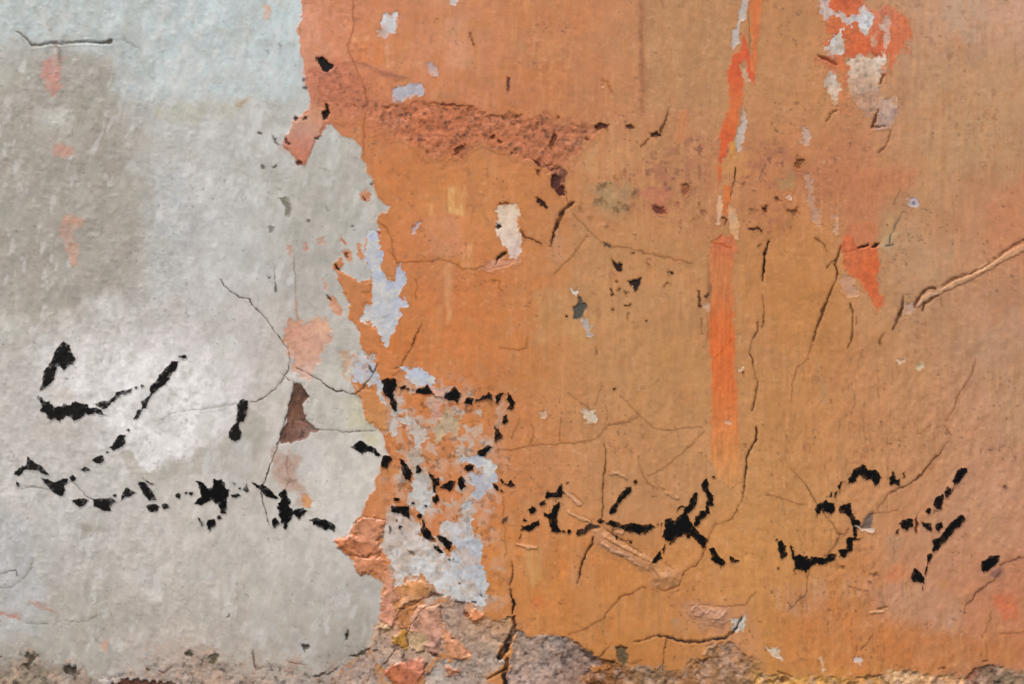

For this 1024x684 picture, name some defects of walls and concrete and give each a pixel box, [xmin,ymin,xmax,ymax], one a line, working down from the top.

crack [15,31,140,65]
flaking render [282,56,611,211]
peeling [813,0,913,154]
peeling [478,201,523,275]
crack [790,188,1024,402]
crack [152,279,422,526]
crack [348,548,375,559]
crack [378,593,444,672]
crack [486,495,518,684]
flaking render [0,230,1024,684]
crack [495,382,705,585]
crack [568,240,850,670]